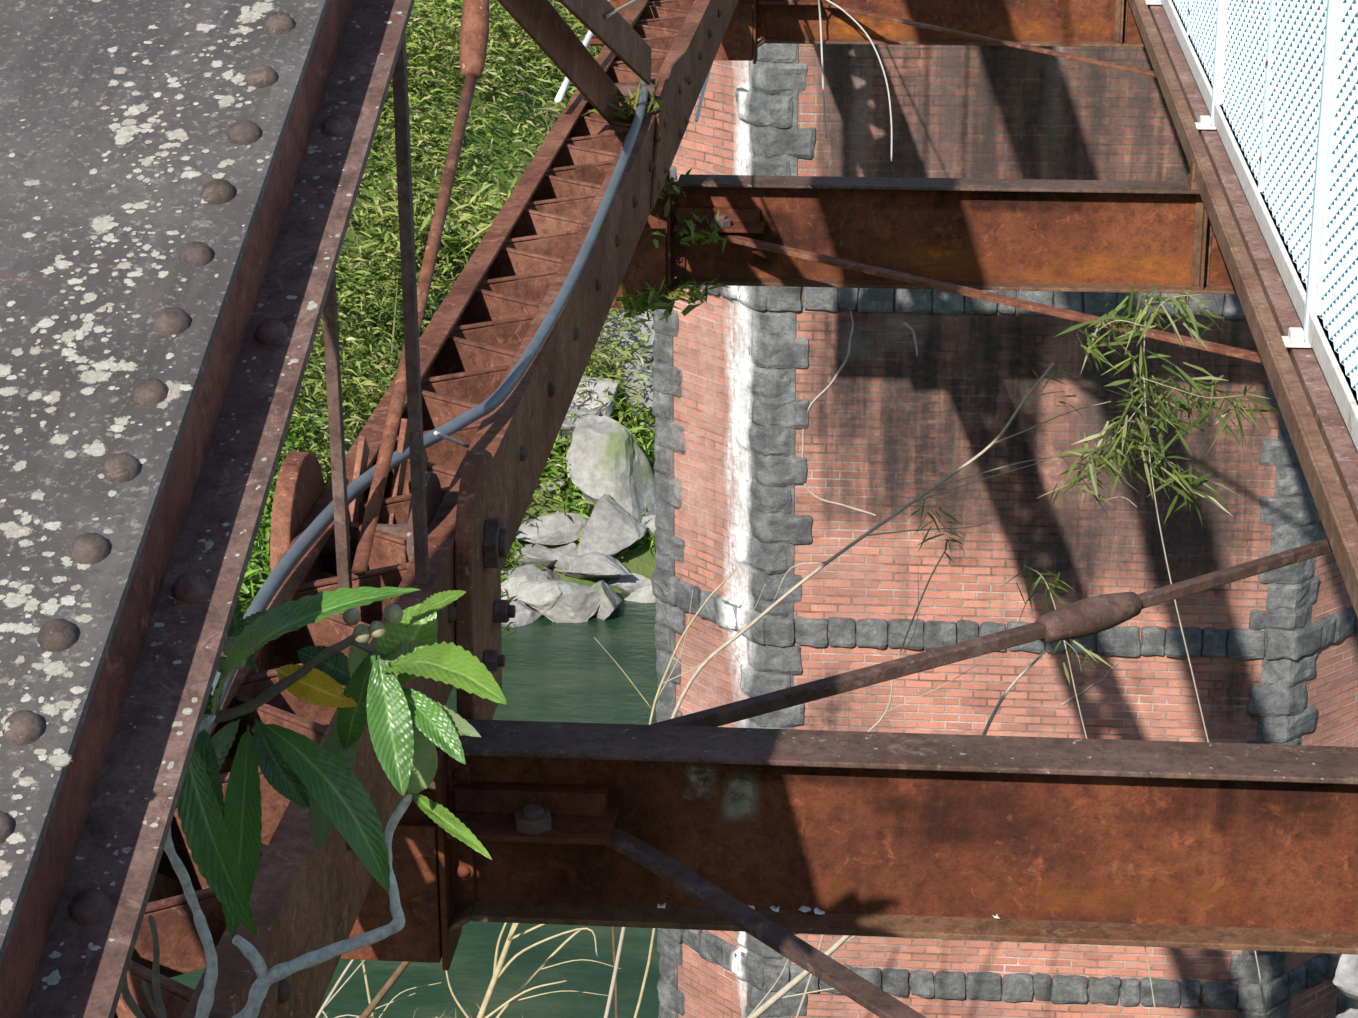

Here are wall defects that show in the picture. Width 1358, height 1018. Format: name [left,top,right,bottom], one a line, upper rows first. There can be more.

corrosion [836,18,897,36]
corrosion [970,191,1026,210]
leakage [981,325,1035,460]
leakage [1108,343,1143,474]
leakage [885,324,961,547]
corrosion [1218,780,1234,820]
corrosion [1285,783,1325,805]